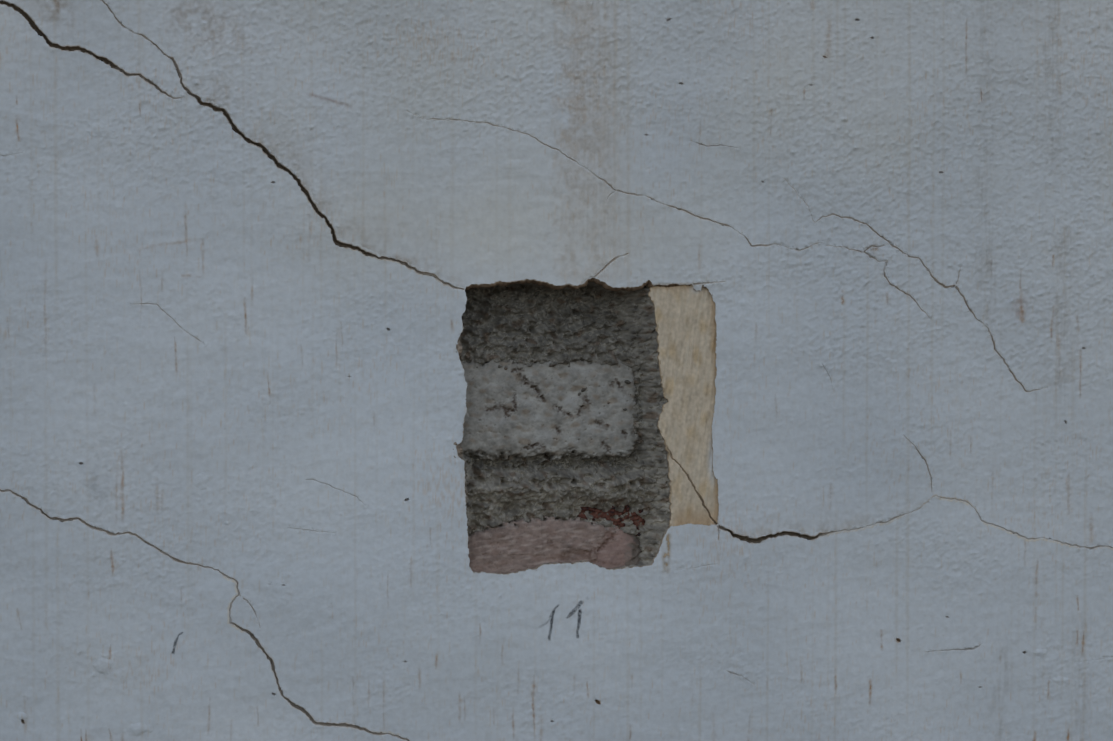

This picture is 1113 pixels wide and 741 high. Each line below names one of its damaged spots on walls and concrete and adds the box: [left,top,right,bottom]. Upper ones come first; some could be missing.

crack [0,0,466,293]
crack [404,108,1050,395]
crack [0,484,414,741]
crack [303,476,368,510]
spalling [453,277,719,575]
crack [666,431,1113,552]